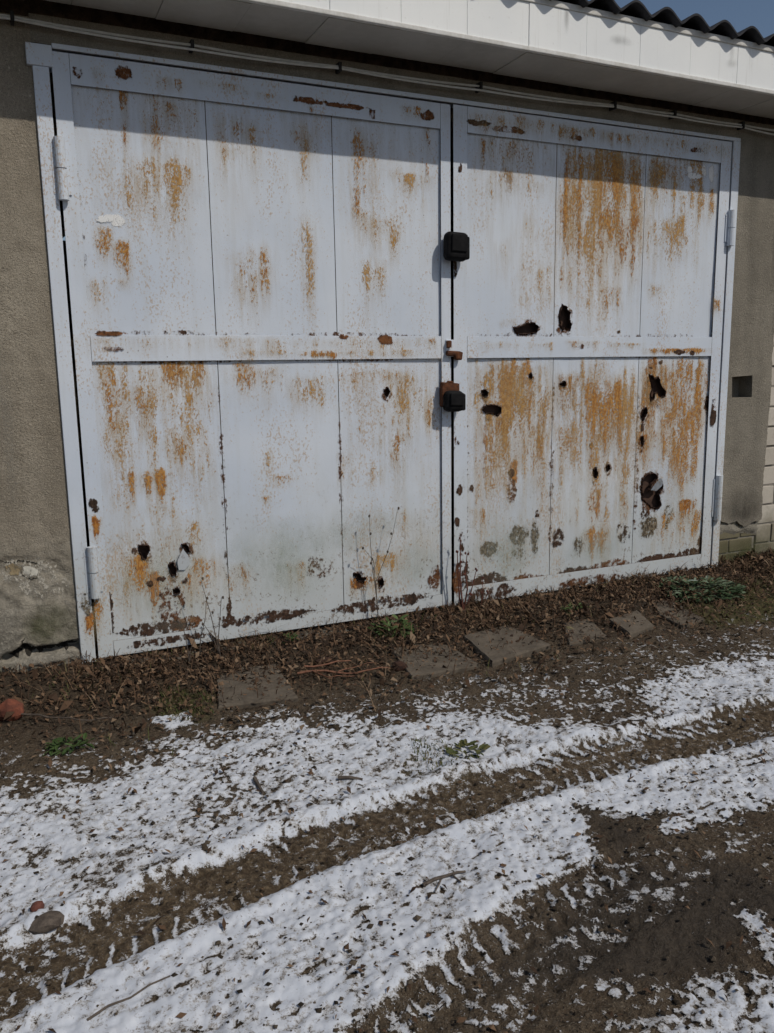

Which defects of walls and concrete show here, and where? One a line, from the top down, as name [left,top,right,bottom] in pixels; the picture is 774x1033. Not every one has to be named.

corrosion [83,227,131,283]
corrosion [111,65,197,228]
corrosion [301,222,316,308]
corrosion [293,96,375,183]
corrosion [351,129,399,249]
corrosion [468,114,721,322]
spalling [1,557,67,600]
corrosion [89,498,101,544]
corrosion [95,330,326,631]
corrosion [286,540,428,596]
corrosion [301,332,439,479]
corrosion [453,322,717,597]